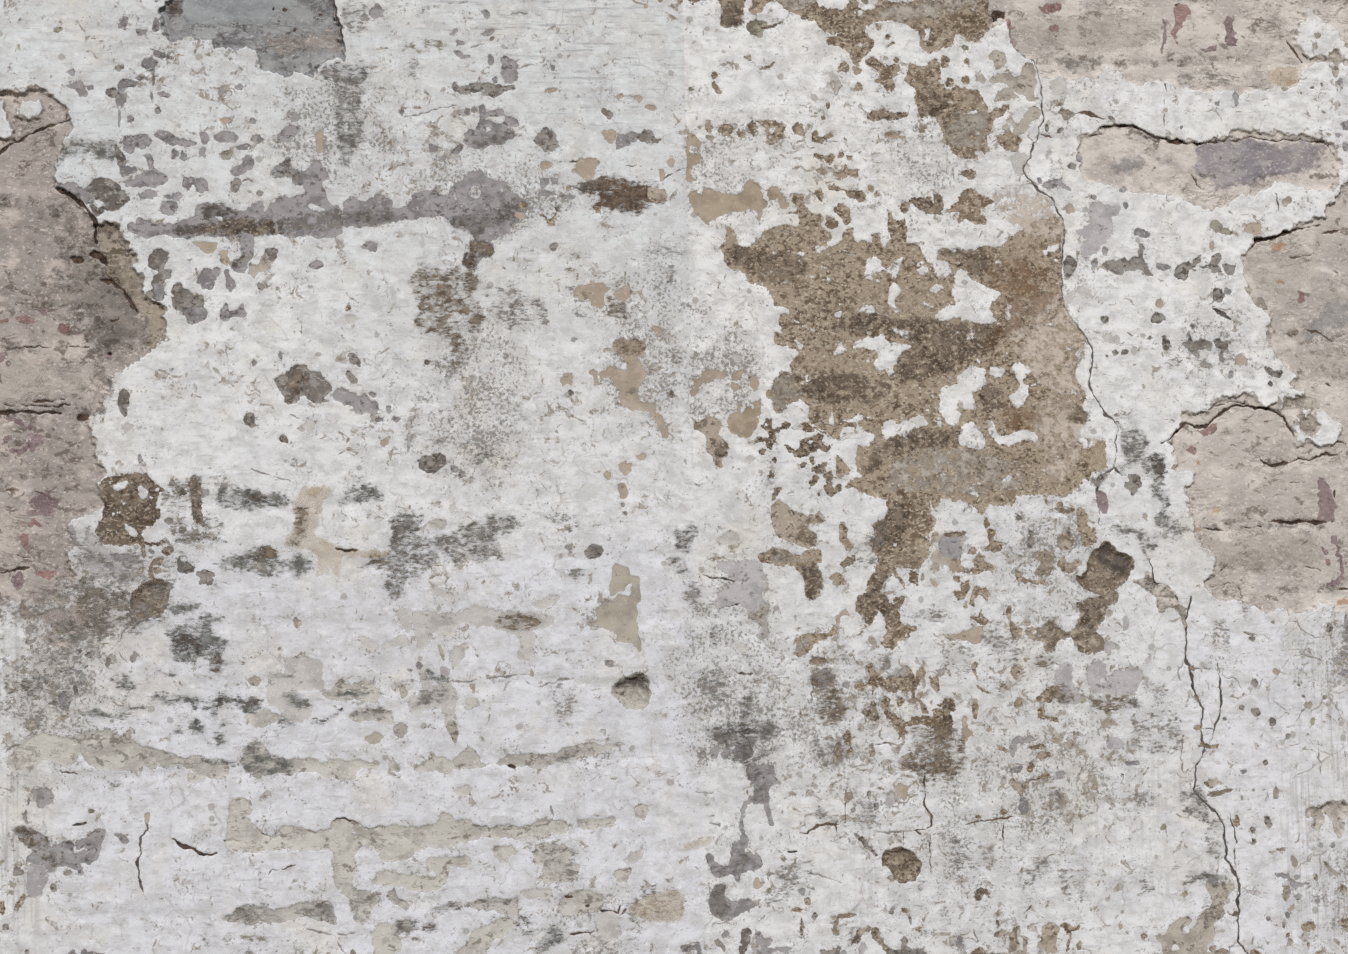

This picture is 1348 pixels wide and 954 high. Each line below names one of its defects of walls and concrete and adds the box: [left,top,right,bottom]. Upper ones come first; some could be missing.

crack [0,105,72,154]
crack [0,399,89,421]
crack [5,188,139,356]
spalling [0,0,598,711]
peeling [589,326,675,439]
peeling [659,0,1348,815]
crack [1022,55,1348,522]
crack [1161,401,1348,590]
peeling [7,585,625,797]
peeling [565,544,642,652]
spalling [605,660,652,710]
crack [1149,560,1315,954]